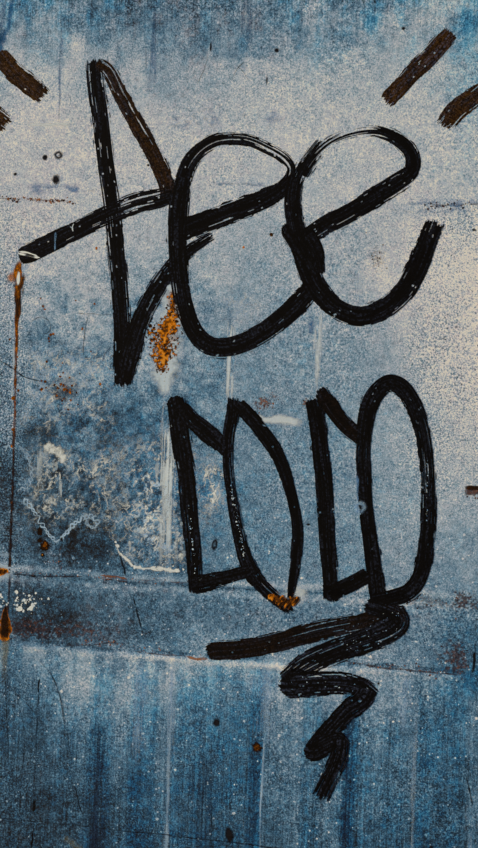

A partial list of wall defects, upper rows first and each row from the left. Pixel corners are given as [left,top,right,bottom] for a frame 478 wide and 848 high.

rust [146,283,183,394]
water stain [4,443,115,542]
rust [0,262,166,655]
water stain [115,419,184,573]
rust [268,585,309,617]